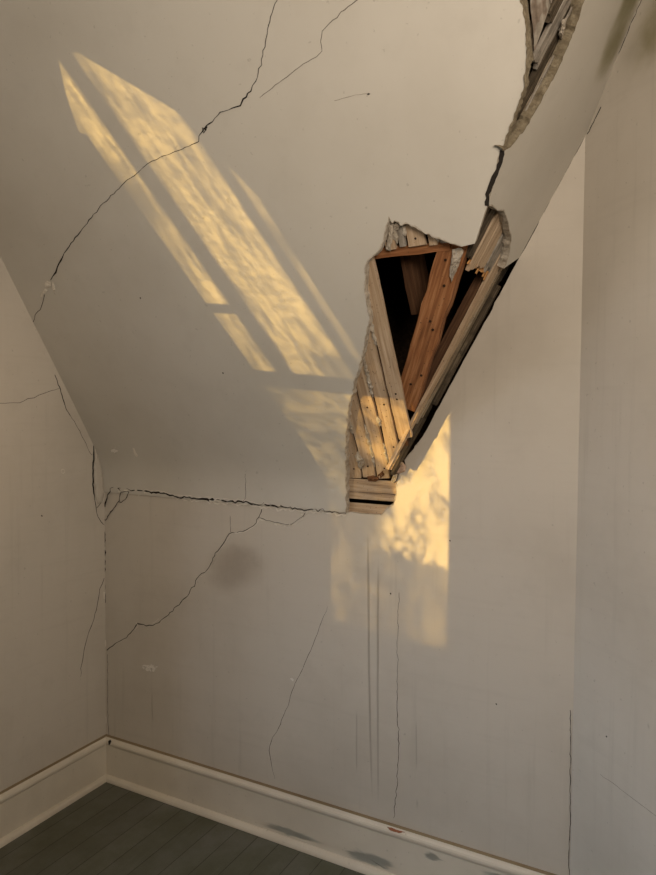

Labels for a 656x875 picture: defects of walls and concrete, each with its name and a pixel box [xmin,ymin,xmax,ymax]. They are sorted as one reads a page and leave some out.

crack [33,0,357,322]
crack [485,150,505,206]
spalling [494,0,584,151]
spalling [345,204,512,516]
crack [3,376,347,733]
crack [269,614,325,774]